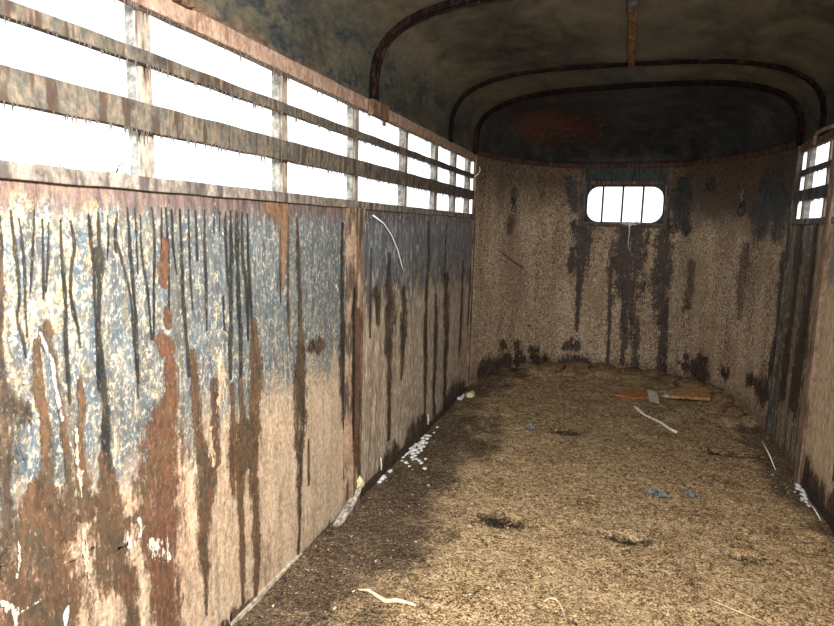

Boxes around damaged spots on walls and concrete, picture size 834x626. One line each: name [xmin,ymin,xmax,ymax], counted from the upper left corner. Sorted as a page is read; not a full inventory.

corrosion [158,237,171,289]
corrosion [265,201,288,289]
water stain [477,216,711,382]
peeling [39,332,63,422]
peeling [216,349,227,413]
corrosion [352,306,362,467]
peeling [74,428,84,498]
corrosion [0,306,264,626]
peeling [208,426,216,467]
peeling [81,527,94,596]
peeling [124,516,172,562]
peeling [0,599,41,626]